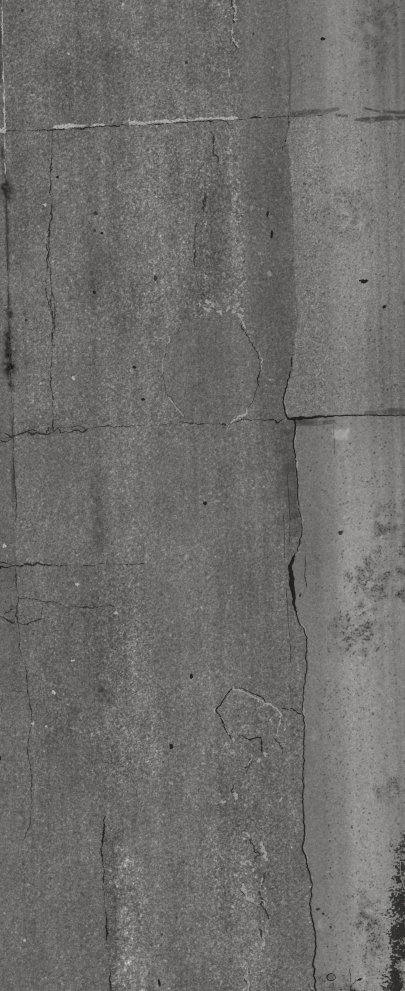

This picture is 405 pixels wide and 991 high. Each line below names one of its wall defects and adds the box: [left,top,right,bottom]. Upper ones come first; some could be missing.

crack [0,96,322,521]
crack [0,561,146,840]
crack [100,816,112,991]
crack [162,308,317,991]